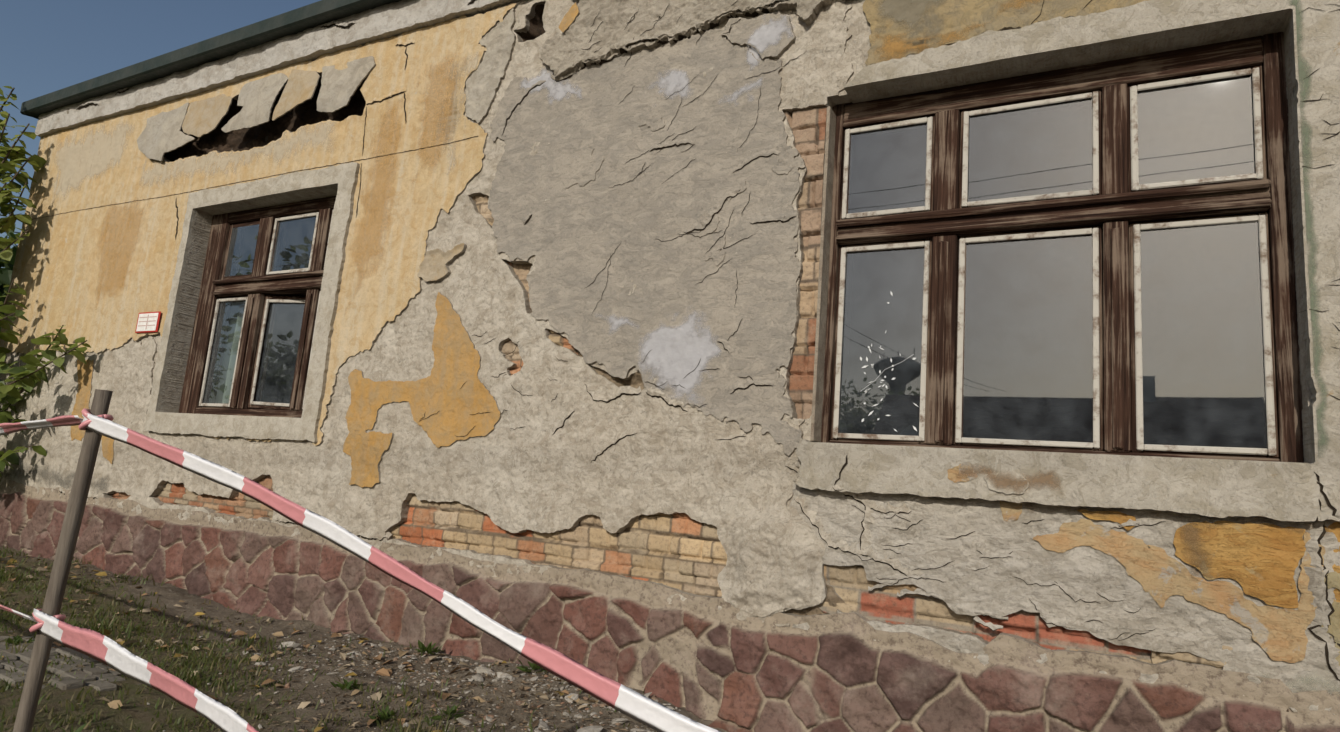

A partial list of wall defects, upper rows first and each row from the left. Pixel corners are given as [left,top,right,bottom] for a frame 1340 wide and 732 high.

crack [32,0,788,240]
flaking render [0,0,854,598]
crack [420,55,801,462]
flaking render [947,462,1029,495]
flaking render [787,483,1340,694]
crack [1304,468,1340,681]